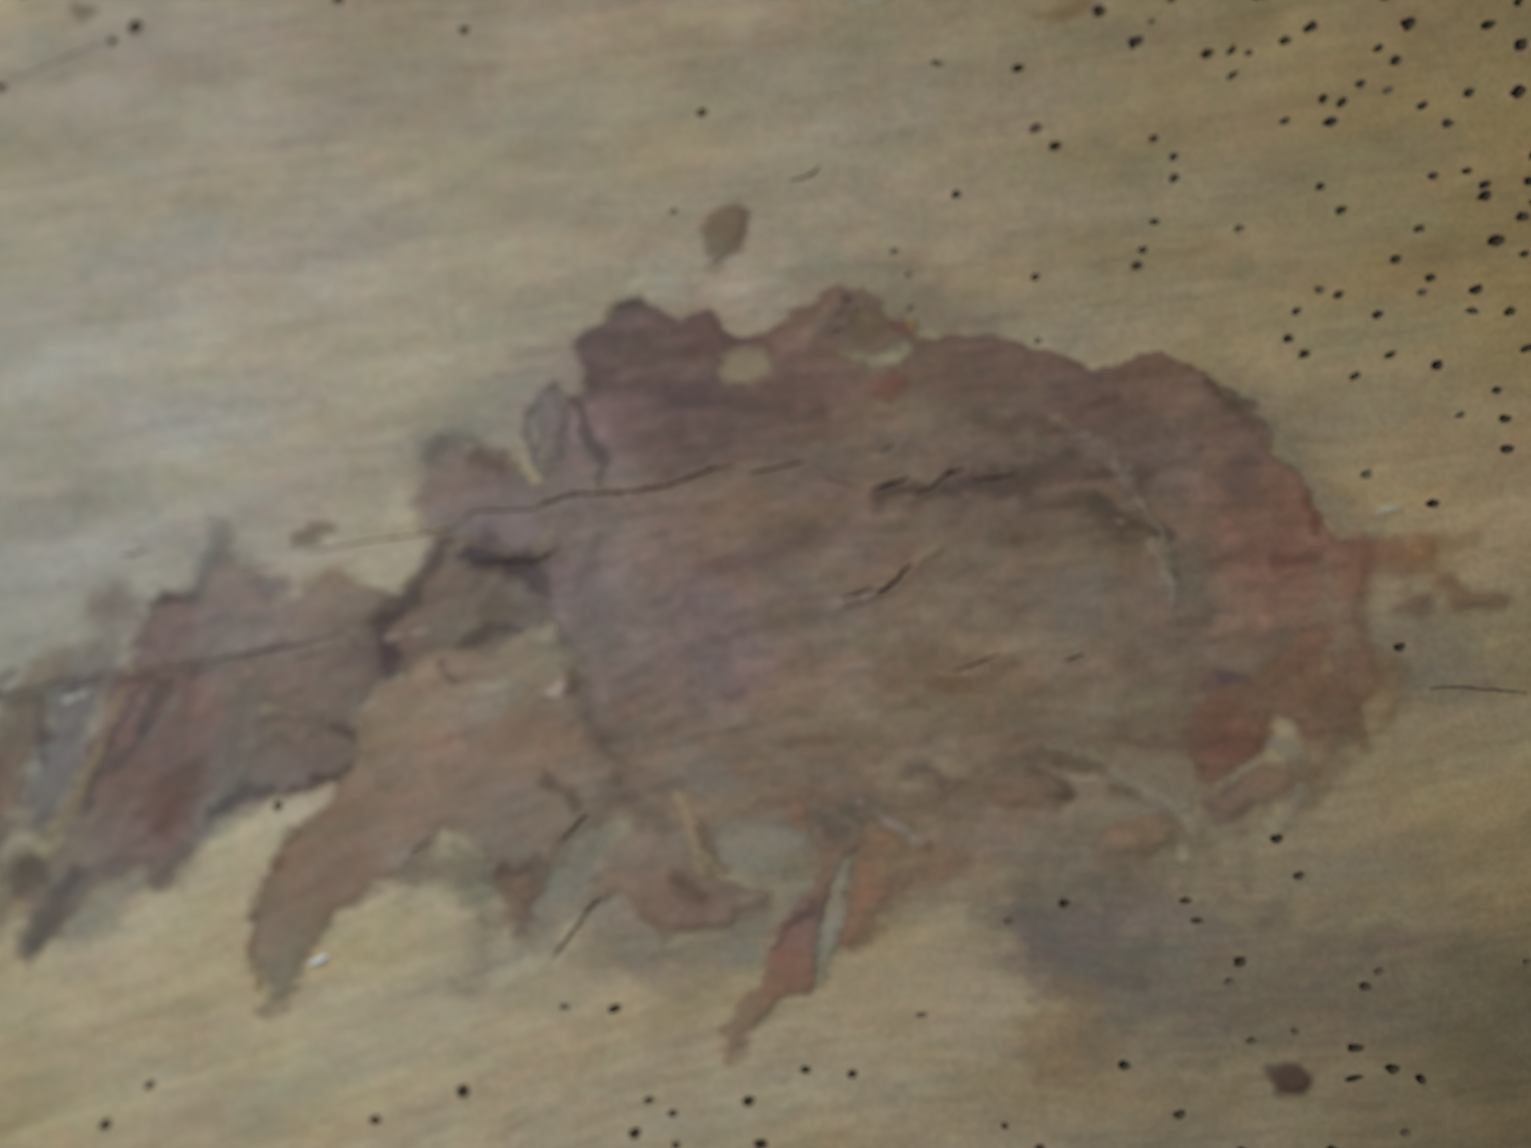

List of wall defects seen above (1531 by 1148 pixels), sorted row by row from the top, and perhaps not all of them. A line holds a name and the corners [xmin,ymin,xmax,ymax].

crack [304,444,1019,565]
water stain [0,206,1450,1056]
crack [841,563,913,599]